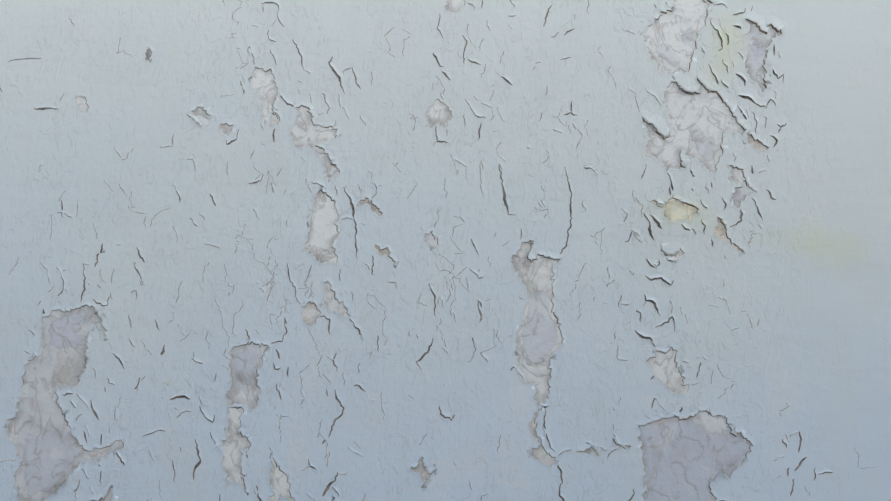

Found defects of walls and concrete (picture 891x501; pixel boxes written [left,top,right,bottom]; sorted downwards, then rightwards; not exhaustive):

crack [24,0,399,501]
peeling [247,63,355,329]
crack [408,0,787,399]
peeling [639,0,773,257]
peeling [3,300,128,501]
peeling [213,336,273,496]
crack [439,406,455,422]
peeling [507,236,568,471]
crack [542,397,628,501]
crack [645,375,684,419]
peeling [609,405,758,501]
crack [773,403,833,496]